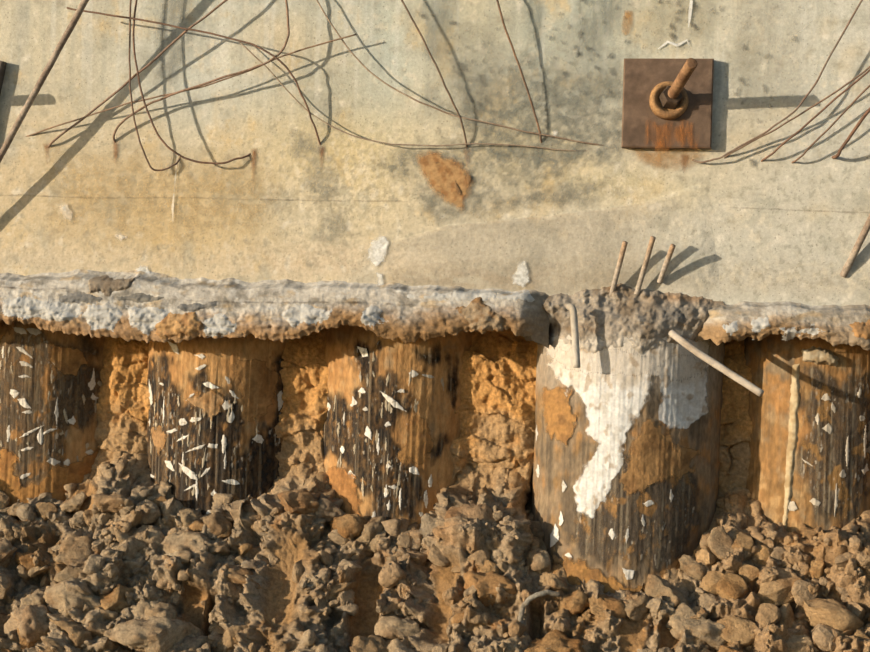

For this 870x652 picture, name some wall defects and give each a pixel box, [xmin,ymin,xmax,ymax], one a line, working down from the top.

spalling [418,152,471,207]
spalling [88,275,140,297]
spalling [154,312,204,355]
spalling [455,297,504,332]
spalling [849,319,870,340]
leakage [545,334,709,518]